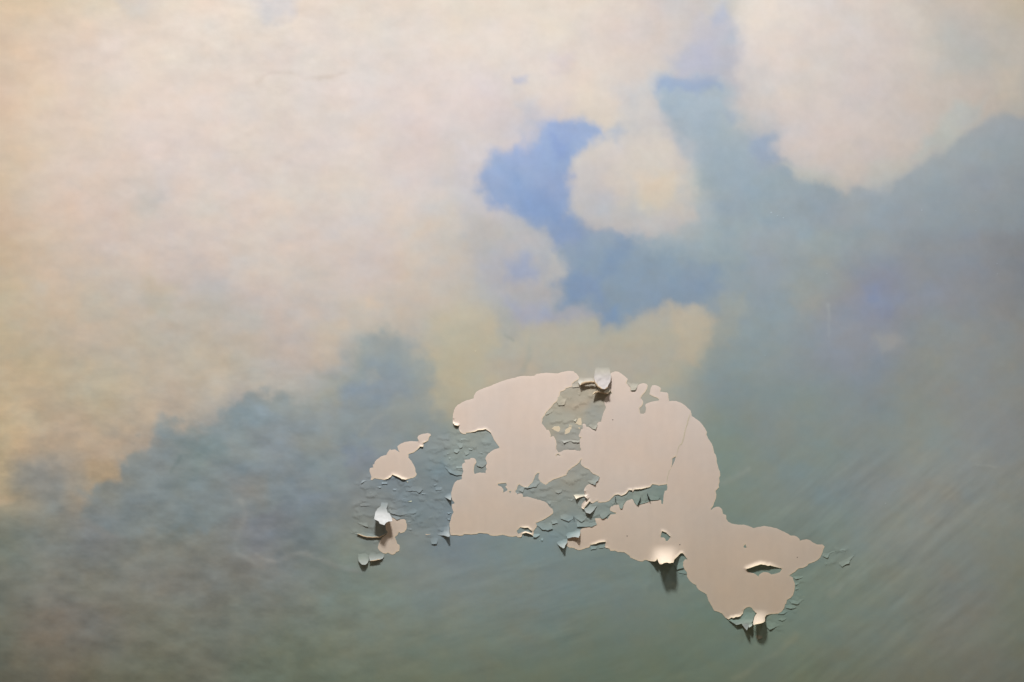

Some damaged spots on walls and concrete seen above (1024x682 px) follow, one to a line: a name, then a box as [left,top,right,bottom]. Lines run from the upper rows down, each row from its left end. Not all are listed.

peeling [349,367,854,639]